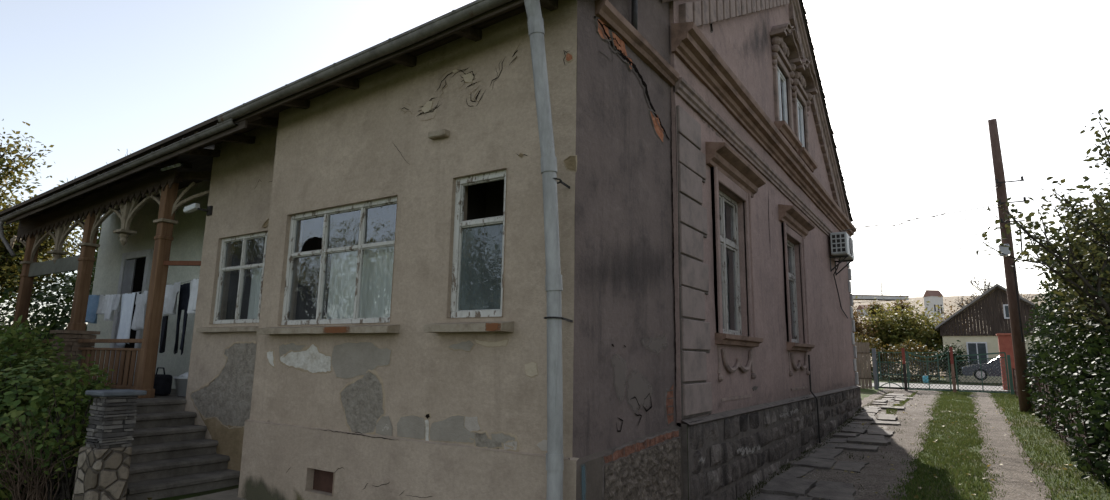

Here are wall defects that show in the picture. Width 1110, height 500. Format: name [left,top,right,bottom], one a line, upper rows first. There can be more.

crack [593,16,676,399]
peeling [190,340,332,471]
peeling [339,370,386,436]